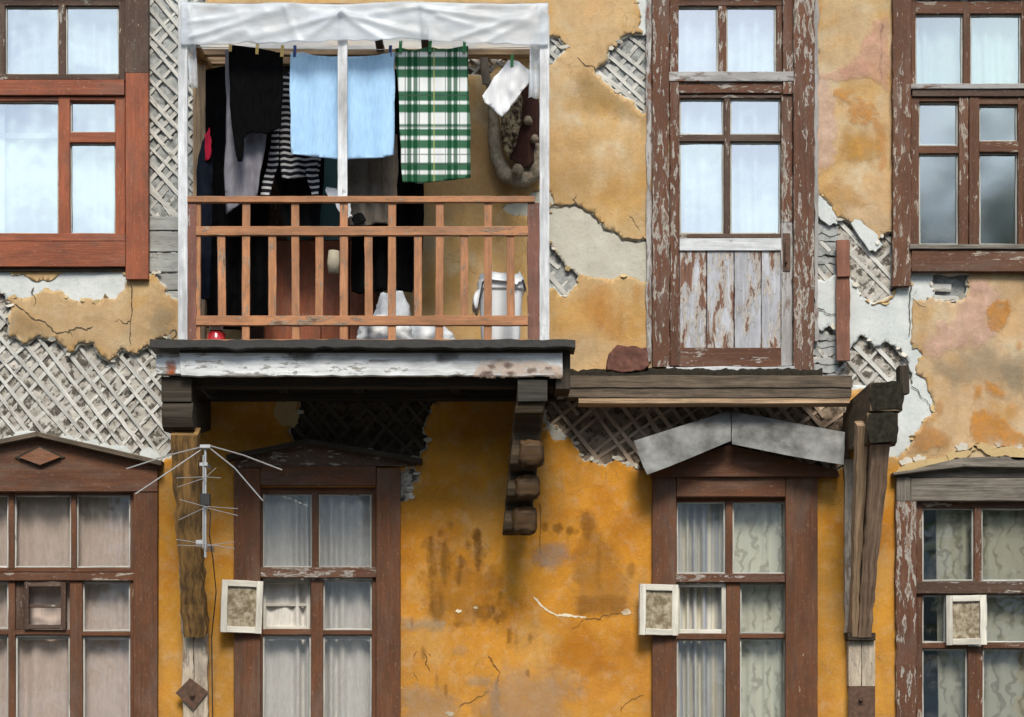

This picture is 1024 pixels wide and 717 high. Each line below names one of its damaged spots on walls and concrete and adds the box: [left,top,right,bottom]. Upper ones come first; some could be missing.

spalling [538,38,570,67]
spalling [596,0,652,114]
peeling [502,191,652,297]
crack [551,197,646,242]
crack [0,287,92,335]
crack [116,286,133,345]
peeling [813,193,986,457]
spalling [0,271,171,460]
spalling [274,401,434,502]
spalling [542,401,847,469]
crack [534,597,620,629]